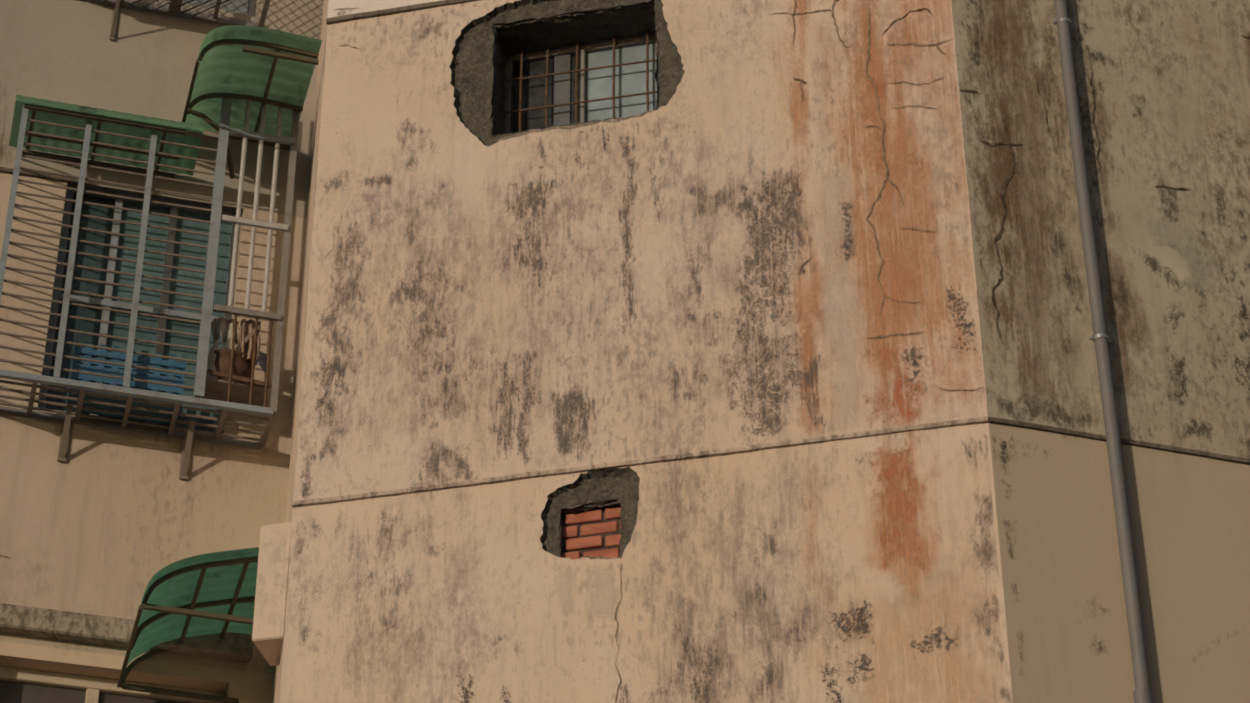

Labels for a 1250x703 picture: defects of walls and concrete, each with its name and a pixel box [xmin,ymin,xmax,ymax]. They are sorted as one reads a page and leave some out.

water stain [504,180,553,281]
spalling [449,0,685,147]
water stain [602,130,636,315]
crack [766,0,980,339]
crack [977,80,1049,345]
crack [1090,71,1100,175]
water stain [317,229,363,416]
mould [690,173,822,436]
spalling [540,467,640,560]
rust [872,448,921,590]
mould [820,596,877,703]
mould [909,627,959,658]